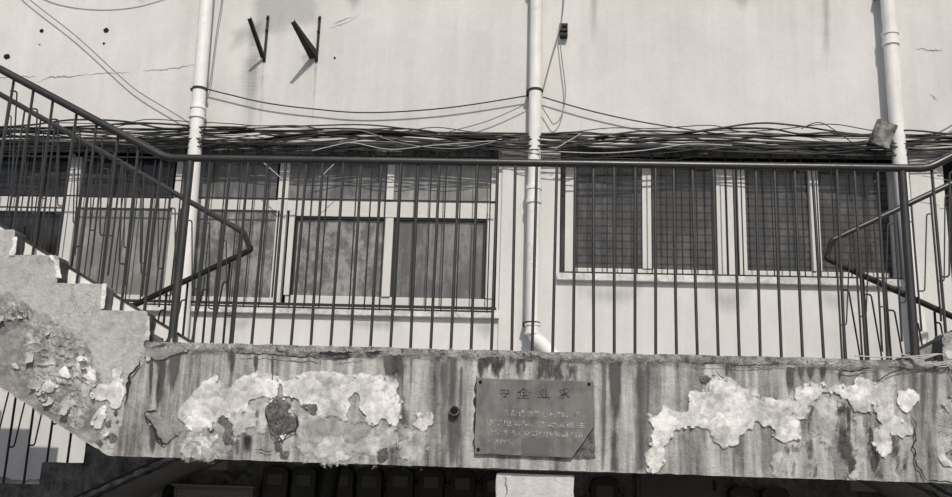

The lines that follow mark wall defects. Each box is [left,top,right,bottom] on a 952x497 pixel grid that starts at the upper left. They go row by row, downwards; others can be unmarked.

peeling [49,255,61,278]
peeling [0,293,126,447]
peeling [145,371,404,458]
leakage [290,355,429,466]
spalling [377,448,388,462]
peeling [413,411,434,432]
leakage [441,357,462,460]
leakage [478,356,526,378]
leakage [602,362,621,470]
leakage [637,363,650,468]
peeling [644,373,920,473]
leakage [787,367,826,392]